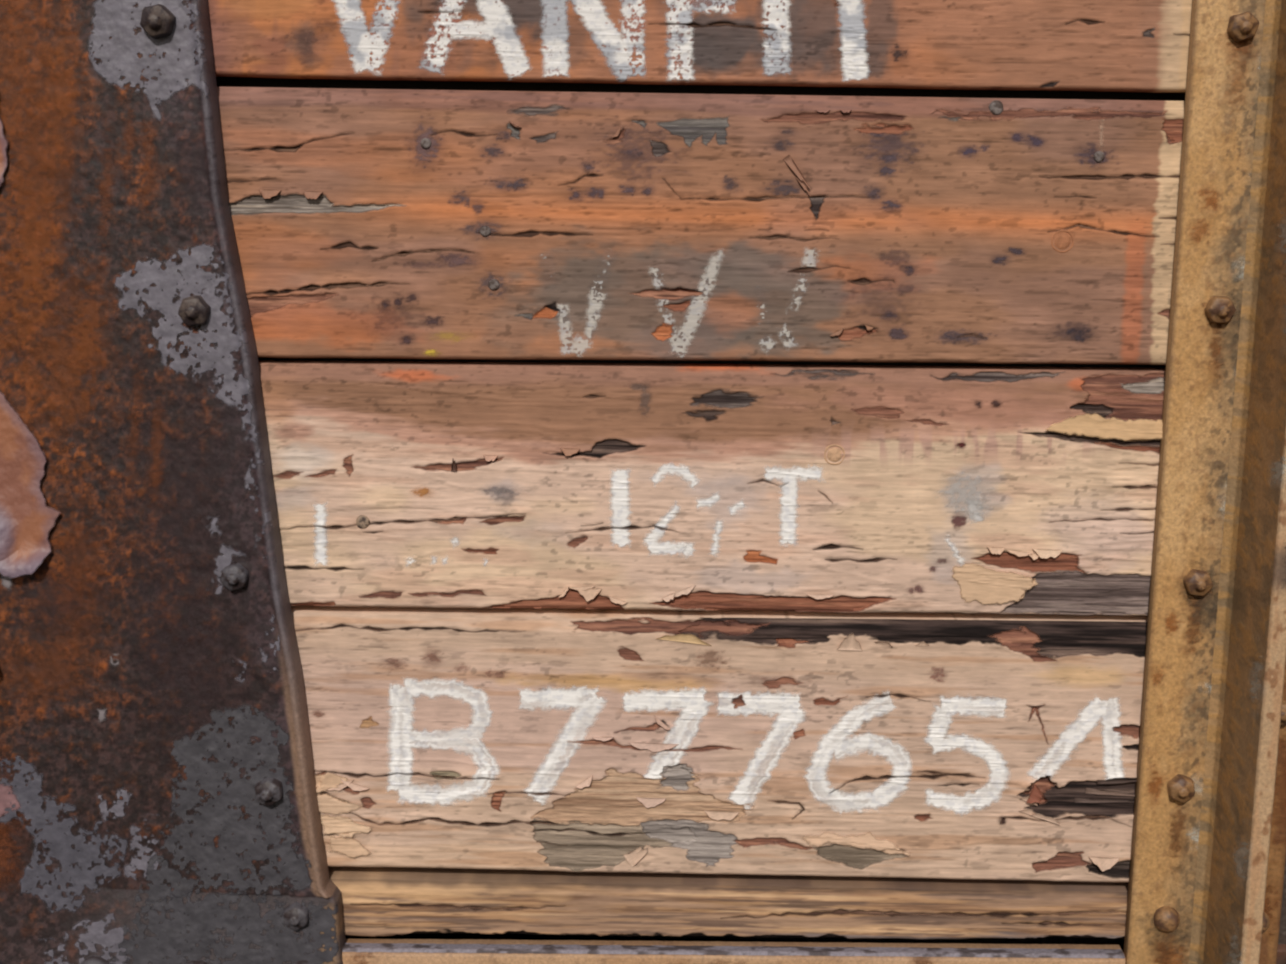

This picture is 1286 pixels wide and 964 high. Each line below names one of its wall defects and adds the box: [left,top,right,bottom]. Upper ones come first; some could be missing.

peeling [89,0,209,120]
peeling [115,244,353,541]
peeling [936,372,1062,382]
peeling [1025,373,1165,454]
rust [1167,601,1200,651]
peeling [1113,725,1144,750]
peeling [0,705,339,964]
peeling [314,772,376,858]
peeling [491,791,505,811]
peeling [1018,776,1137,825]
rust [1170,813,1184,857]
peeling [1032,852,1130,878]